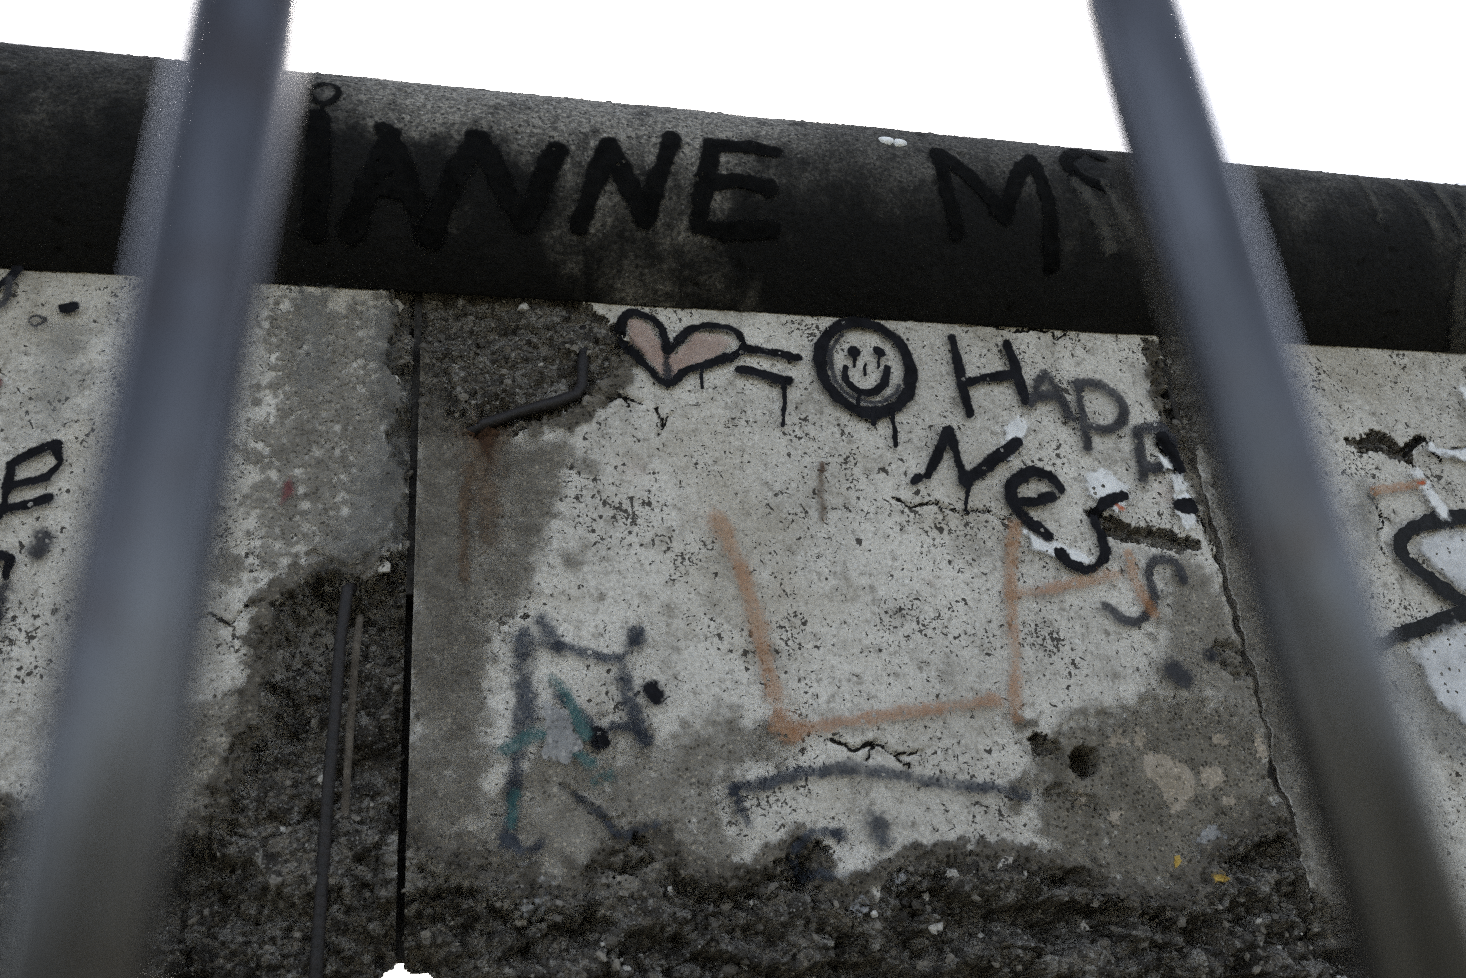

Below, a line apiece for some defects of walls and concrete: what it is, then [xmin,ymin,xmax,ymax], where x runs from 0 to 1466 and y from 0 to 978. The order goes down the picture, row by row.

crack [1196,514,1214,551]
spalling [159,286,1352,978]
crack [829,738,918,769]
spalling [0,791,22,916]